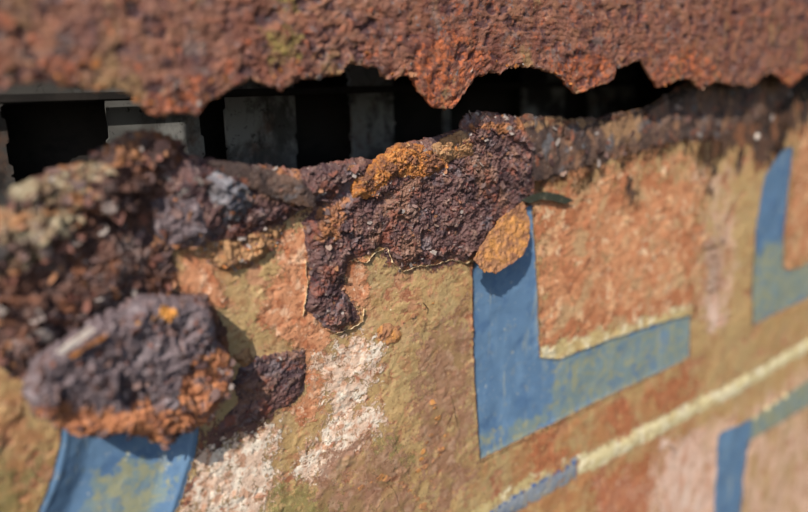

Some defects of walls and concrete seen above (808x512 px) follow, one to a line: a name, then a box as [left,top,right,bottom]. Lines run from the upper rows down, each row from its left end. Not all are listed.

leakage [522,87,808,205]
corrosion [297,74,793,349]
corrosion [0,128,373,508]
corrosion [526,428,570,481]
corrosion [602,391,638,443]
corrosion [583,448,662,512]